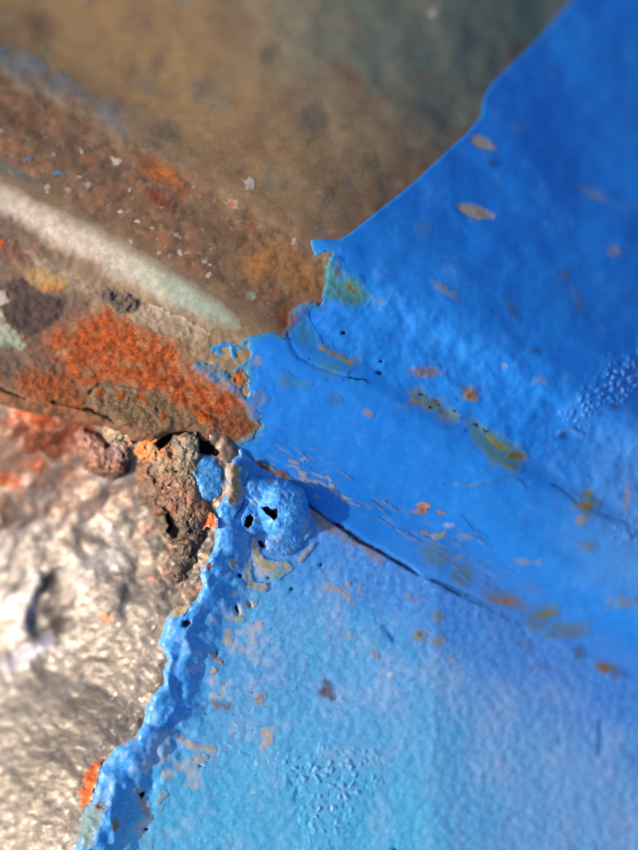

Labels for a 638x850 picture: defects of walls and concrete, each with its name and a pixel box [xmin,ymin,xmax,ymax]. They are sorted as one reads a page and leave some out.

peeling [0,152,244,352]
peeling [455,202,497,221]
crack [0,387,27,400]
corrosion [0,299,264,539]
spalling [156,431,219,456]
corrosion [402,382,531,476]
spalling [166,513,179,539]
peeling [207,536,315,675]
peeling [224,449,508,598]
crack [308,504,519,626]
peeling [315,678,335,703]
corrosion [73,758,123,850]